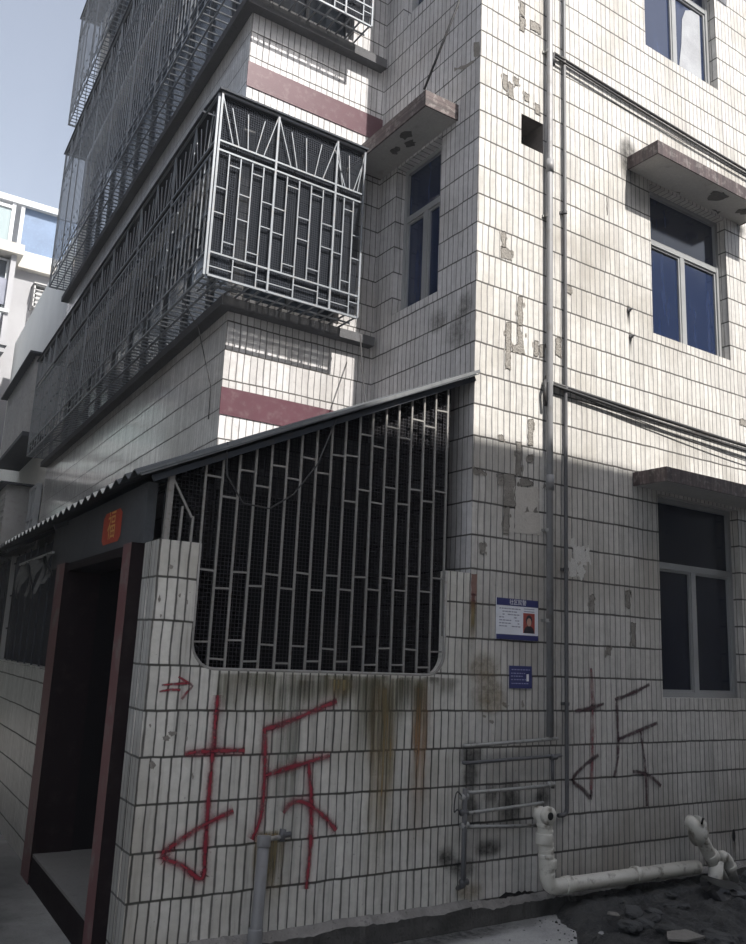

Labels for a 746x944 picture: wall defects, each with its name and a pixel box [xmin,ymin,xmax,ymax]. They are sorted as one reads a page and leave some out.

spalling [518,0,542,35]
spalling [501,73,541,116]
peeling [390,131,416,154]
peeling [707,191,729,214]
spalling [500,231,514,261]
spalling [504,296,562,370]
peeling [472,419,546,536]
peeling [568,538,591,581]
rust [414,686,427,769]